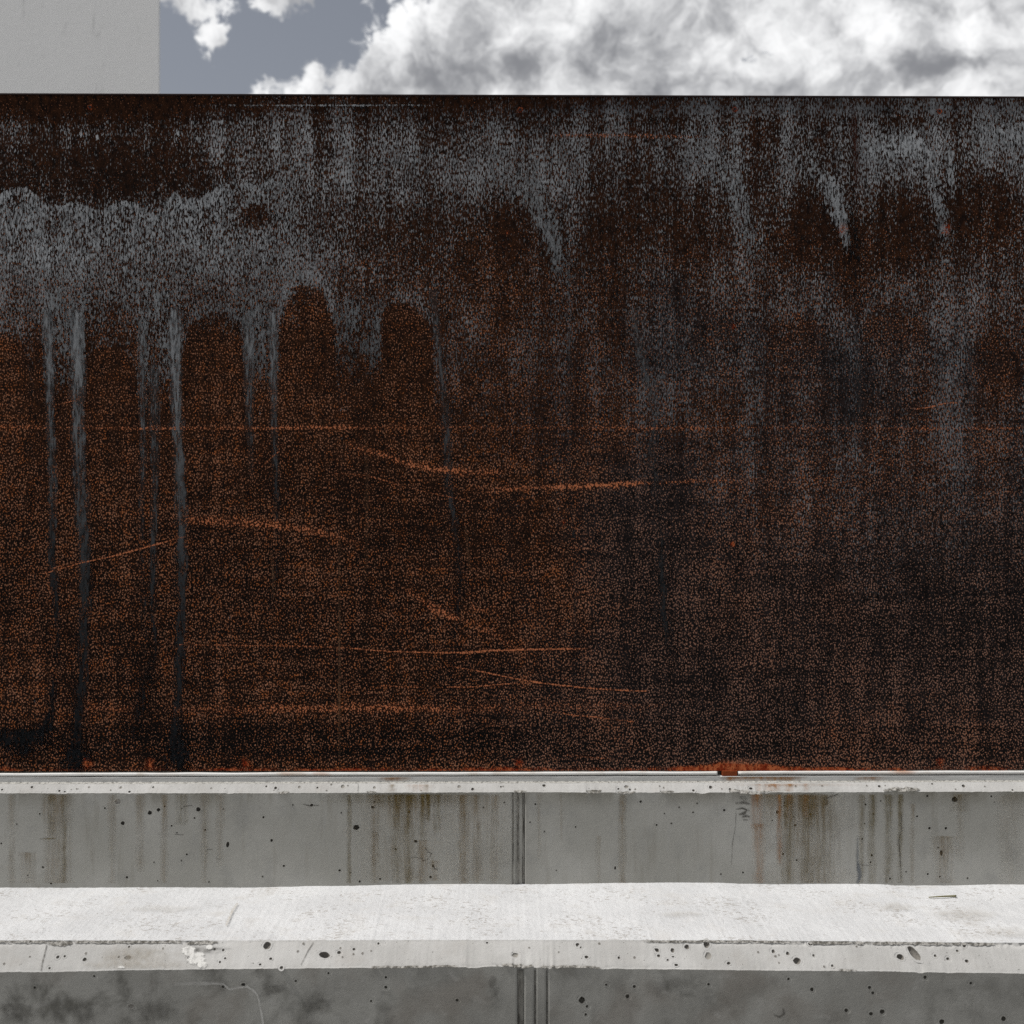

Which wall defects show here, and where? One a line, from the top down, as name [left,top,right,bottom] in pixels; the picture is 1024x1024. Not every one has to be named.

damp [489,151,570,291]
damp [332,293,384,380]
damp [0,176,339,777]
rust [348,442,511,477]
rust [493,478,773,494]
rust [186,514,351,541]
rust [402,588,516,649]
rust [175,640,553,720]
rust [202,759,276,771]
rust [294,760,572,780]
rust [589,760,913,816]